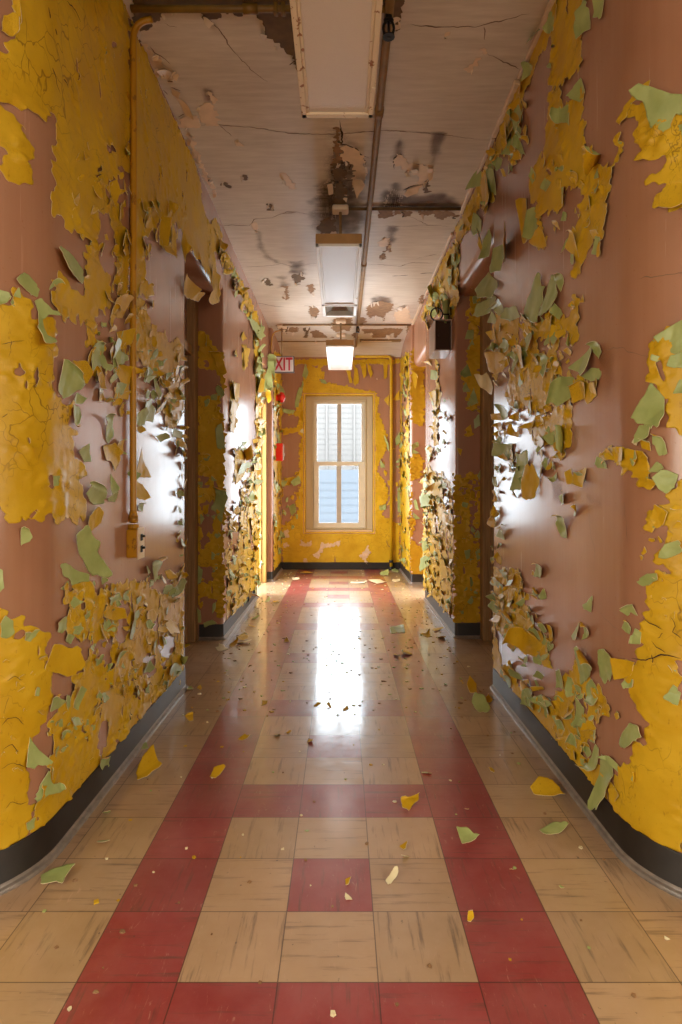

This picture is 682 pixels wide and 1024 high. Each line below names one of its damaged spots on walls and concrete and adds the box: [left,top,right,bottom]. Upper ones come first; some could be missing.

crack [413,14,526,69]
leakage [318,153,364,233]
crack [219,124,480,190]
leakage [381,187,456,207]
peeling [0,0,481,850]
peeling [378,0,682,852]